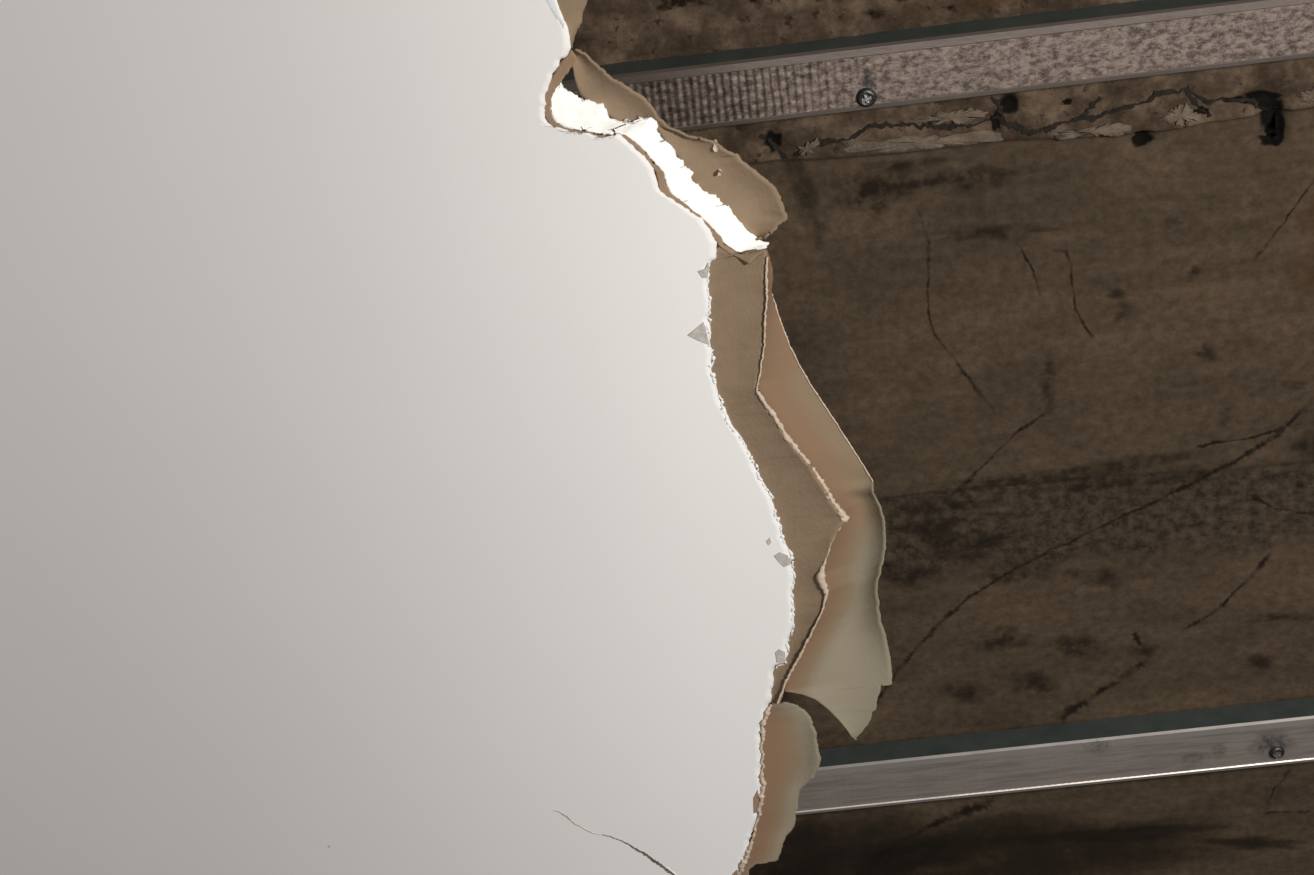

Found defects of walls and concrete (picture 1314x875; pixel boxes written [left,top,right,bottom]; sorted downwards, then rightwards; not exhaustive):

spalling [759,86,1314,159]
crack [553,810,677,875]